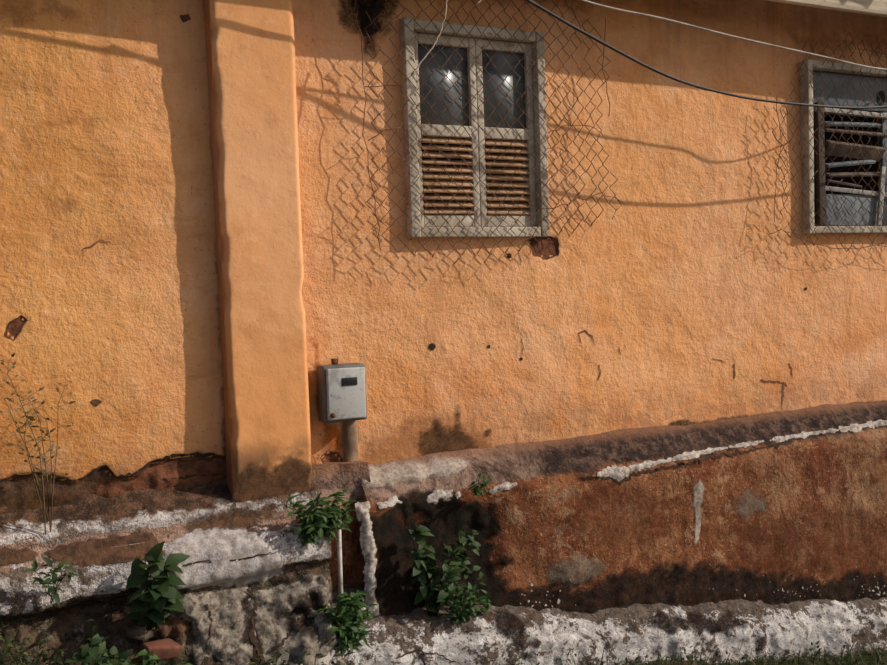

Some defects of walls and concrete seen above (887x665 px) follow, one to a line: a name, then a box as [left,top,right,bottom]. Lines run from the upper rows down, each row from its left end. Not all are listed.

spalling [529,236,559,260]
leakage [362,406,478,487]
spalling [0,452,227,514]
crack [182,551,279,567]
leakage [496,560,887,614]
crack [168,573,347,665]